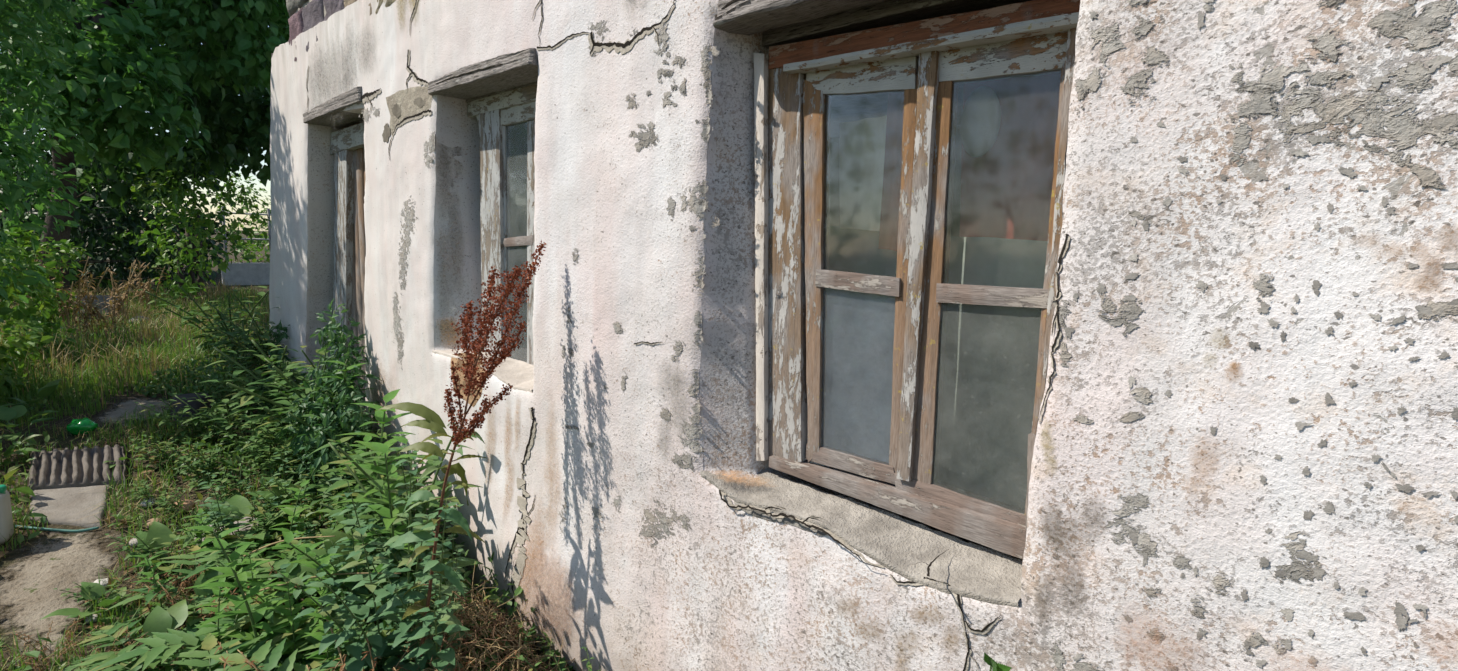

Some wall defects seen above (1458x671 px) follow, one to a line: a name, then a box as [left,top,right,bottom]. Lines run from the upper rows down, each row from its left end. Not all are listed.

crack [347,0,432,159]
crack [531,0,675,56]
peeling [626,20,719,152]
peeling [1220,0,1458,189]
peeling [392,195,418,369]
crack [1038,234,1070,422]
peeling [1252,273,1322,341]
crack [503,407,537,618]
crack [719,490,1002,671]
peeling [1105,486,1248,640]
peeling [1240,608,1314,668]
peeling [1259,501,1339,589]